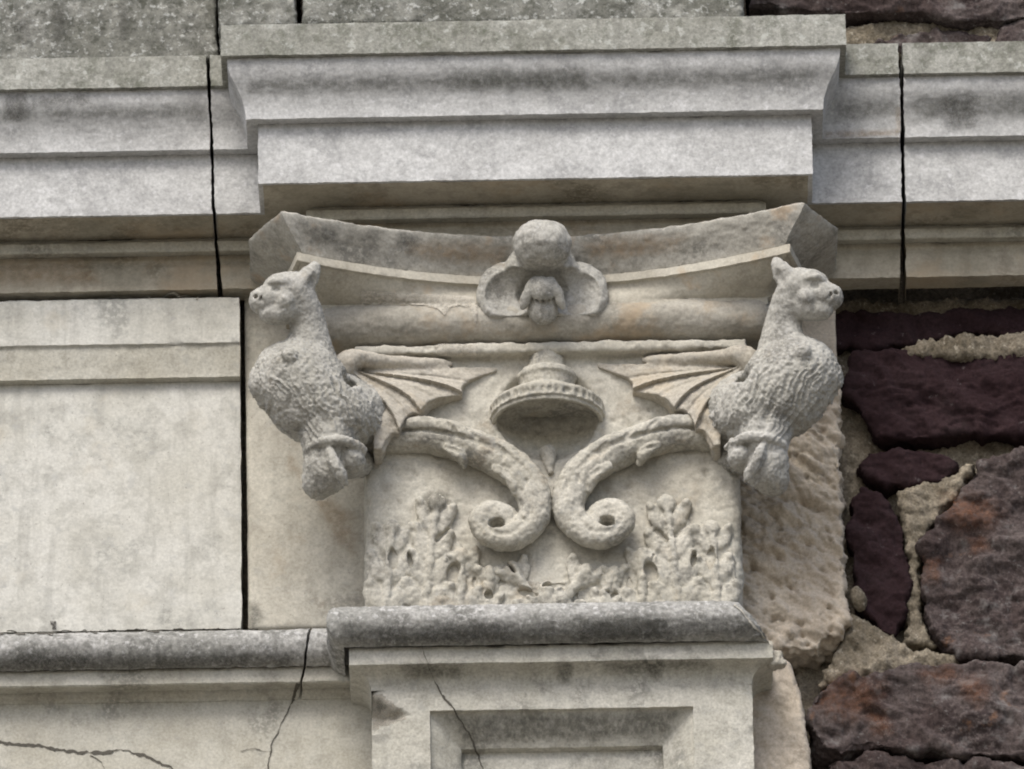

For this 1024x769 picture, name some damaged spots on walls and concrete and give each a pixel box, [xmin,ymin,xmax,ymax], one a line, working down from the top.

crack [0,740,173,769]
crack [244,683,300,769]
crack [423,651,484,769]